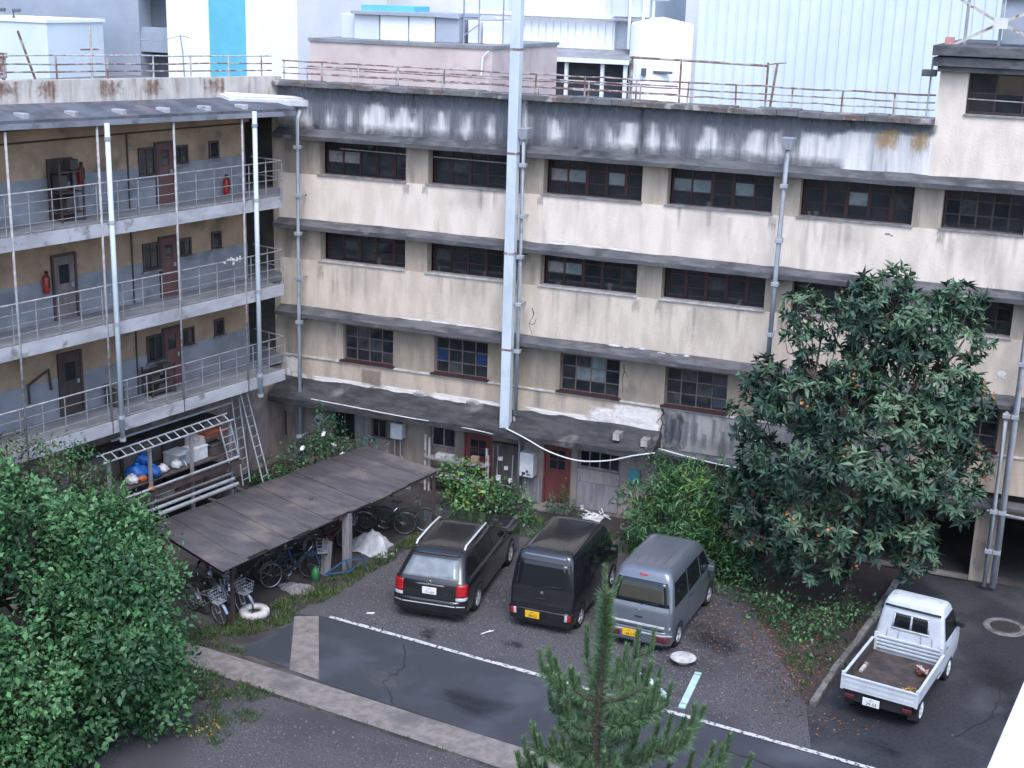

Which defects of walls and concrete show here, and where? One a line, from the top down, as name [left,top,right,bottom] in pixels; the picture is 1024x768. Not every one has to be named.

leakage [277,86,509,144]
leakage [521,101,933,169]
spalling [525,404,660,431]
crack [657,408,667,442]